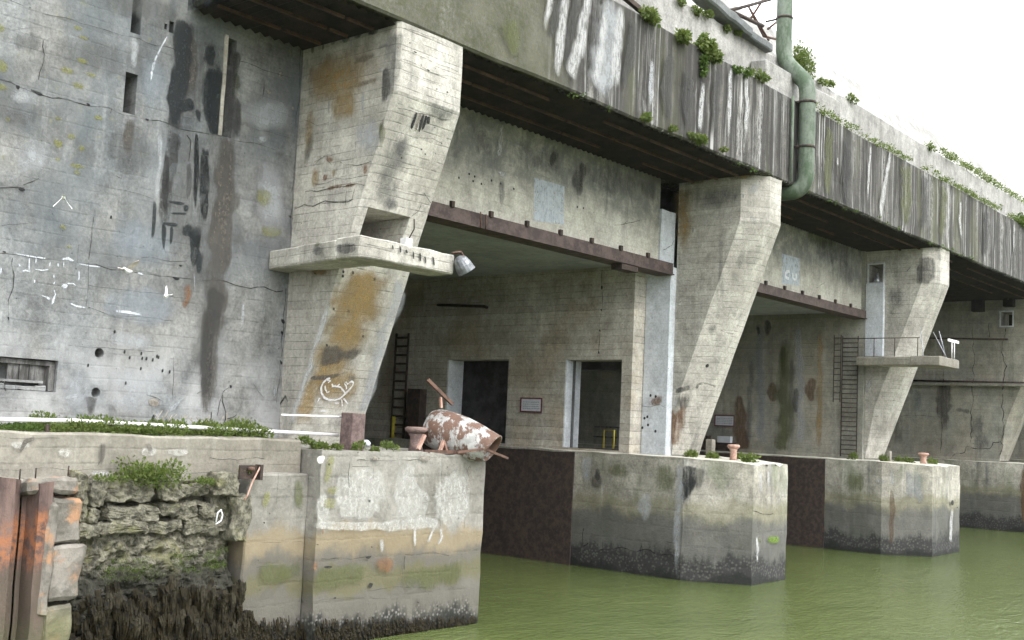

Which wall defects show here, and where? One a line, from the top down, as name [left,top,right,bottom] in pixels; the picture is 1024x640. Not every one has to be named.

crack [0,41,120,114]
damp [546,0,637,89]
damp [649,55,732,136]
crack [146,119,208,158]
damp [151,21,241,410]
damp [18,254,98,303]
crack [888,325,1007,455]
damp [937,382,969,425]
damp [661,466,704,556]